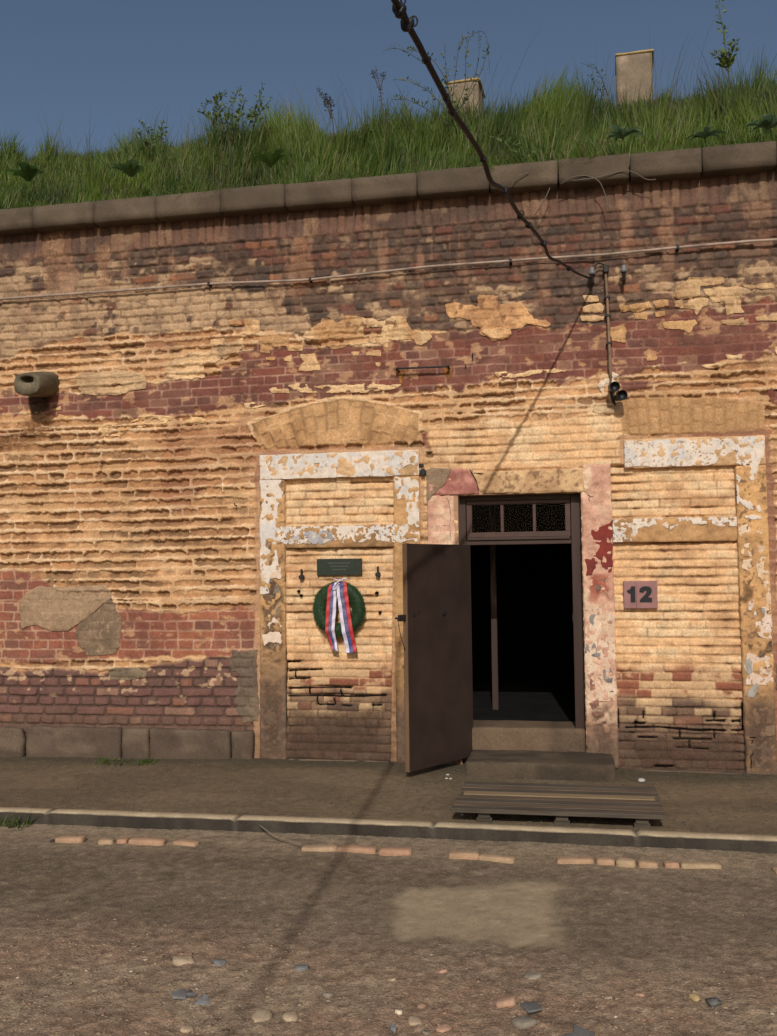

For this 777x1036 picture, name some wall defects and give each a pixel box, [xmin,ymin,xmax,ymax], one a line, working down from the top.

flaking render [445,295,551,342]
flaking render [580,276,777,343]
flaking render [165,315,432,393]
flaking render [495,368,566,381]
peeling [259,450,420,595]
peeling [613,436,772,639]
peeling [262,615,283,646]
peeling [585,601,617,717]
peeling [744,653,774,698]